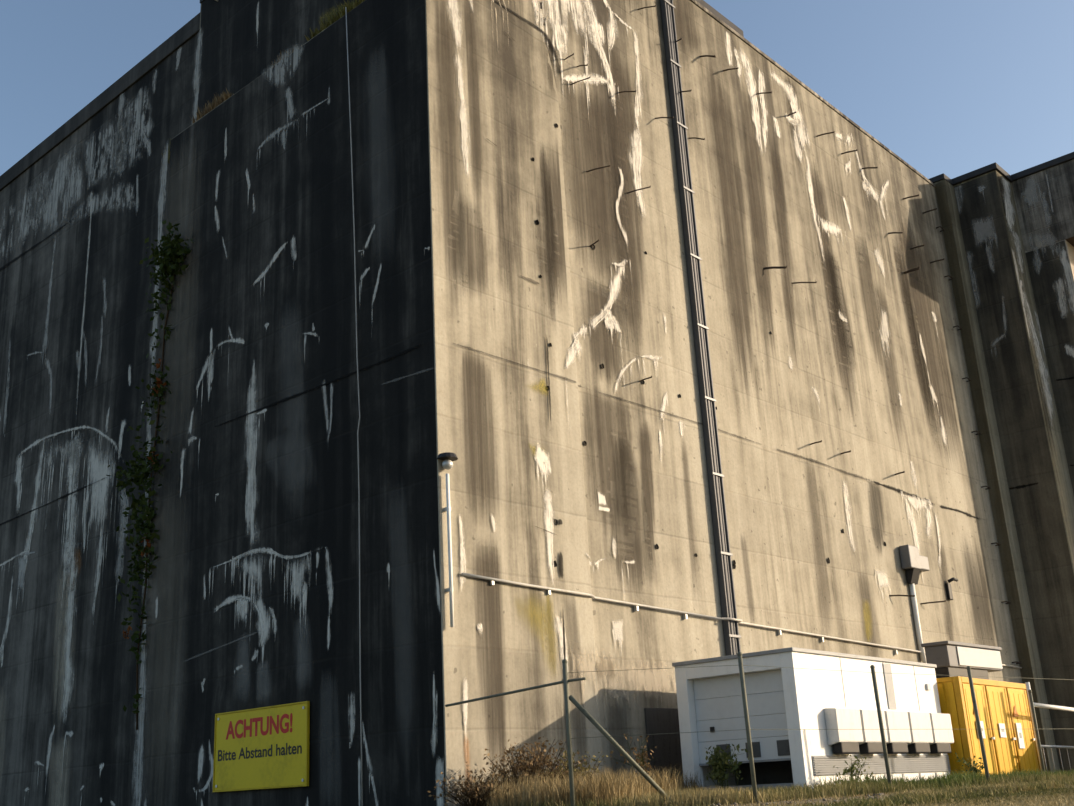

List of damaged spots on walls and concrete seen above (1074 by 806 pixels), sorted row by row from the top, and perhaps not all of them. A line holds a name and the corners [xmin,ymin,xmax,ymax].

leakage [0,413,129,710]
leakage [150,144,168,366]
leakage [204,363,333,673]
leakage [438,0,483,282]
leakage [463,352,494,503]
leakage [459,517,505,762]
efflorescence [535,446,554,580]
leakage [532,0,645,375]
leakage [587,392,668,601]
leakage [712,32,854,404]
leakage [836,133,889,219]
leakage [857,232,957,443]